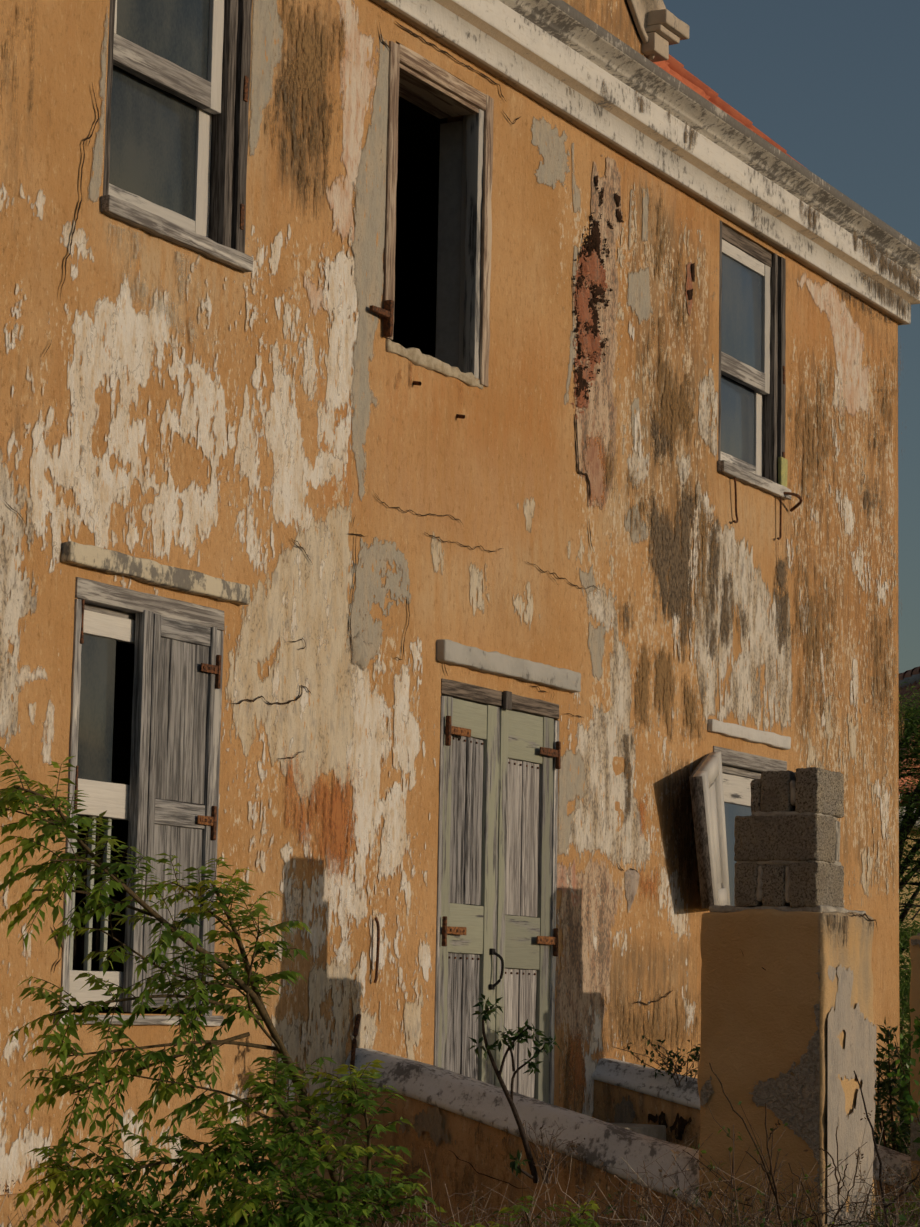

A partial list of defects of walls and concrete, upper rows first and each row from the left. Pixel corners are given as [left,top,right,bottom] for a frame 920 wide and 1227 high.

crack [60,84,99,301]
leakage [266,0,347,215]
leakage [837,230,920,323]
peeling [0,0,436,1129]
crack [231,686,312,705]
crack [348,491,599,650]
leakage [601,194,747,822]
peeling [531,116,899,1117]
leakage [774,364,844,742]
corrosion [282,759,360,873]
peeling [117,1108,184,1181]
peeling [749,964,876,1227]